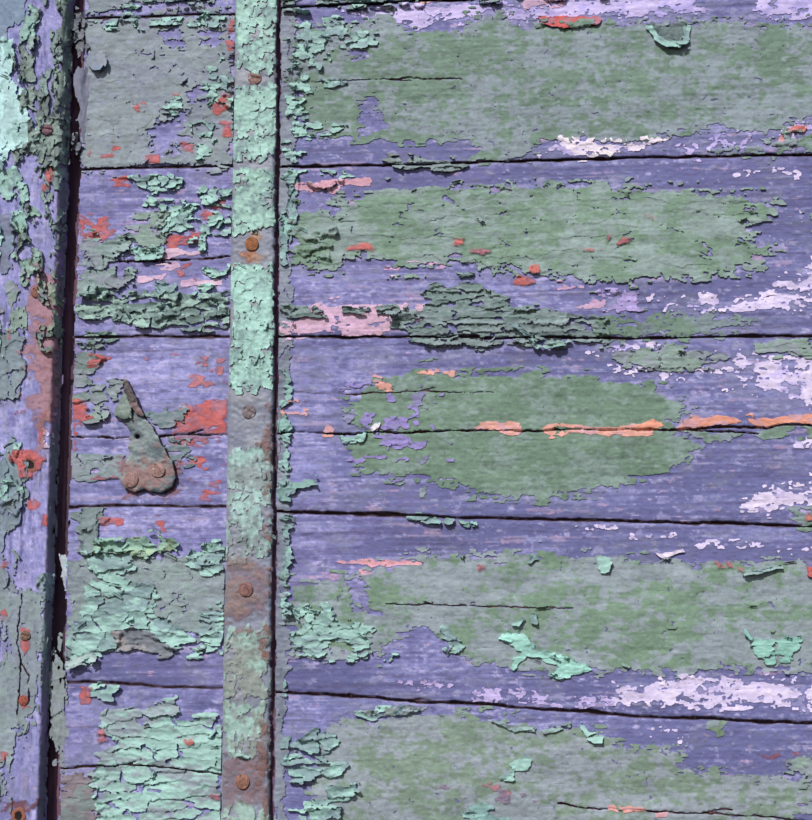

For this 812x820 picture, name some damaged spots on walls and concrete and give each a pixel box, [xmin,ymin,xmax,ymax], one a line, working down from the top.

peeling [0,0,277,353]
peeling [71,0,812,511]
rust [16,263,62,451]
rust [255,425,272,474]
crack [321,428,489,436]
crack [522,426,591,434]
crack [635,424,812,435]
crack [16,596,30,715]
peeling [0,436,812,820]
rust [4,798,39,820]
rust [223,723,269,816]
crack [646,809,791,820]